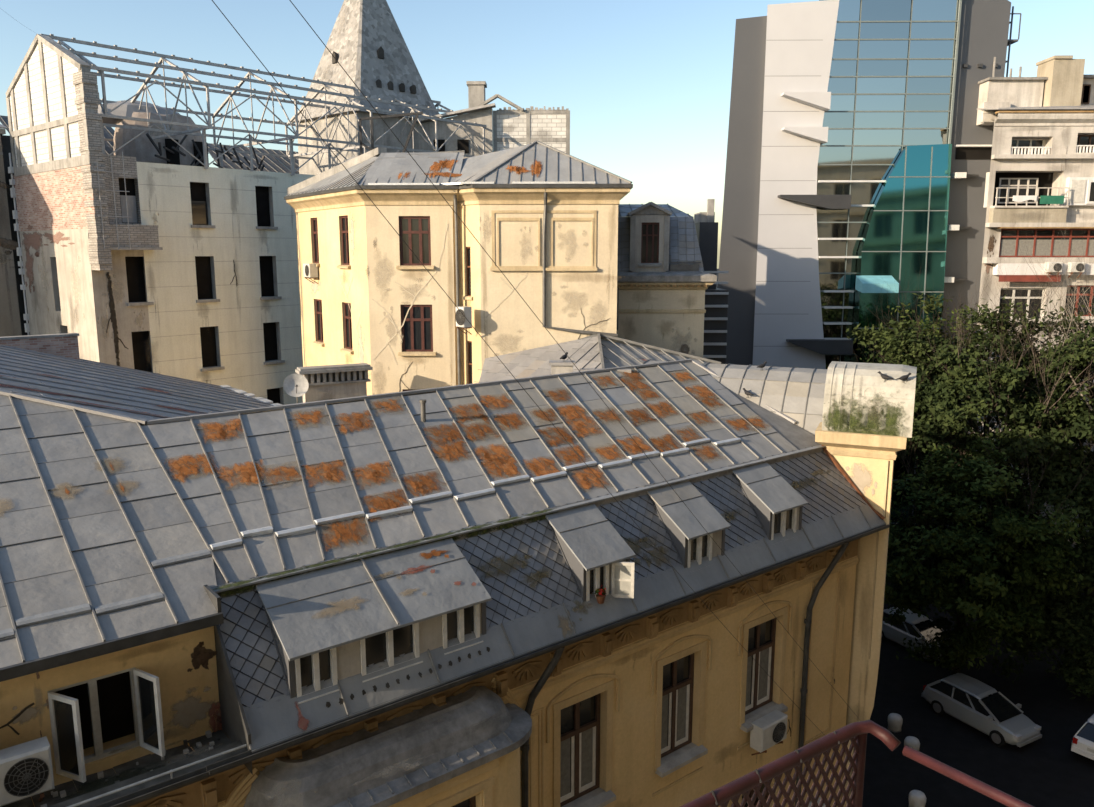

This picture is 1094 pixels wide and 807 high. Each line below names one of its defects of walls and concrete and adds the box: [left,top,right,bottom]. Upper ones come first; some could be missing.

rust [425,159,462,178]
rust [507,159,542,176]
spalling [22,226,74,293]
crack [106,272,128,366]
rust [0,375,241,441]
rust [295,410,325,426]
rust [339,399,402,433]
rust [424,359,723,489]
rust [168,454,439,549]
rust [374,550,449,579]
peeling [187,642,217,672]
crack [0,703,35,735]